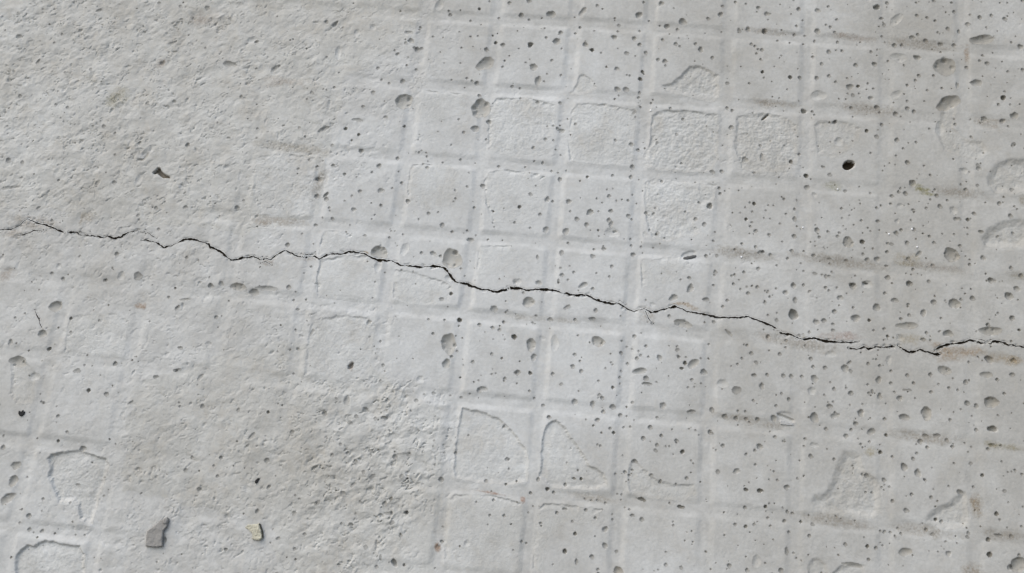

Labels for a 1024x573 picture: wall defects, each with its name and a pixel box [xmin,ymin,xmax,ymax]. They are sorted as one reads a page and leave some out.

crack [0,218,1024,357]